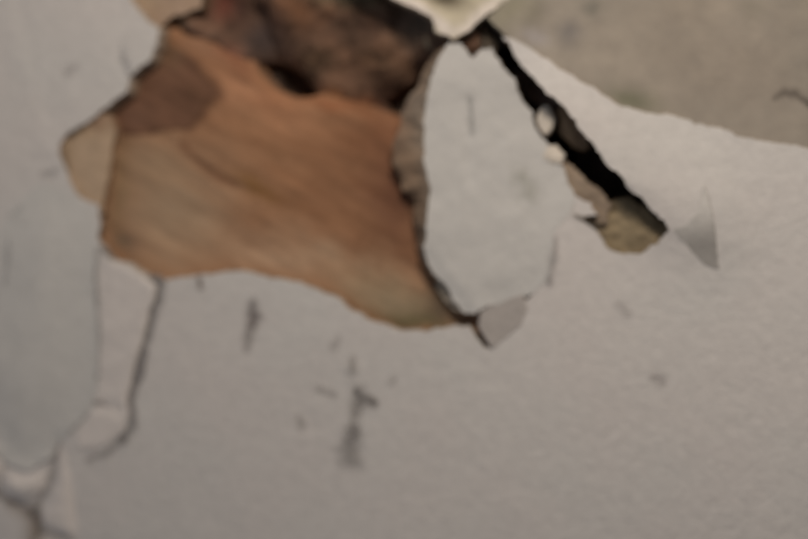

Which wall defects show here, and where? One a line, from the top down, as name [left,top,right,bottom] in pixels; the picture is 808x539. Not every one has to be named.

spalling [61,0,808,452]
crack [105,275,165,454]
peeling [2,444,79,539]